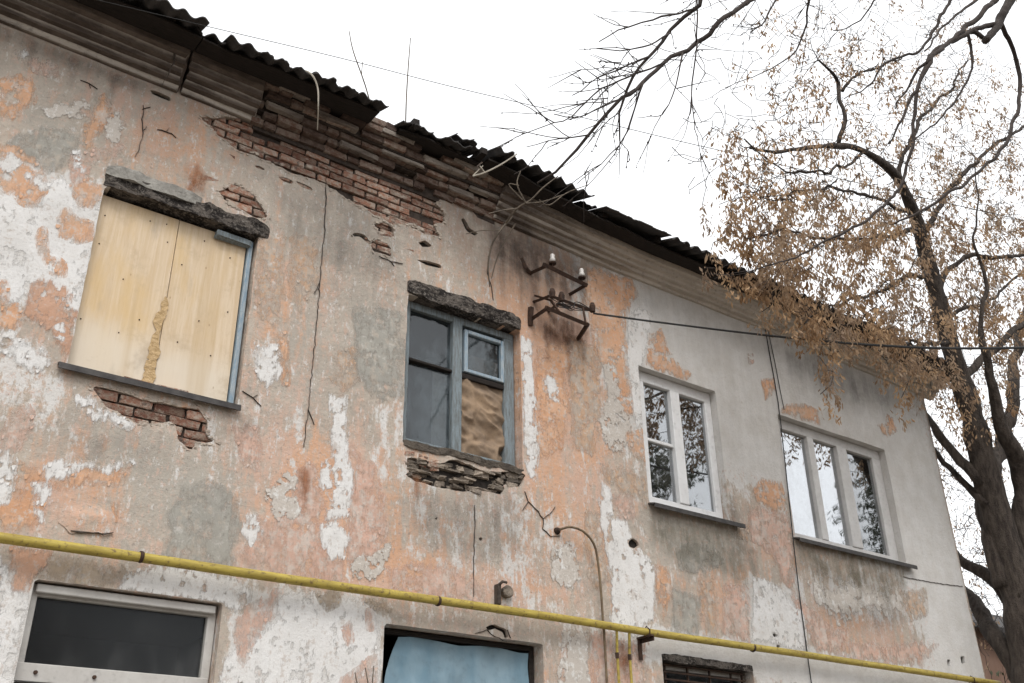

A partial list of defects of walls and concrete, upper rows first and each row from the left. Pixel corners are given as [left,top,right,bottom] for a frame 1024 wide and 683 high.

peeling [0,74,127,374]
flaking render [75,376,221,451]
peeling [0,393,485,683]
crack [303,182,327,447]
flaking render [198,114,447,257]
crack [523,491,555,536]
peeling [403,267,691,495]
peeling [550,482,673,683]